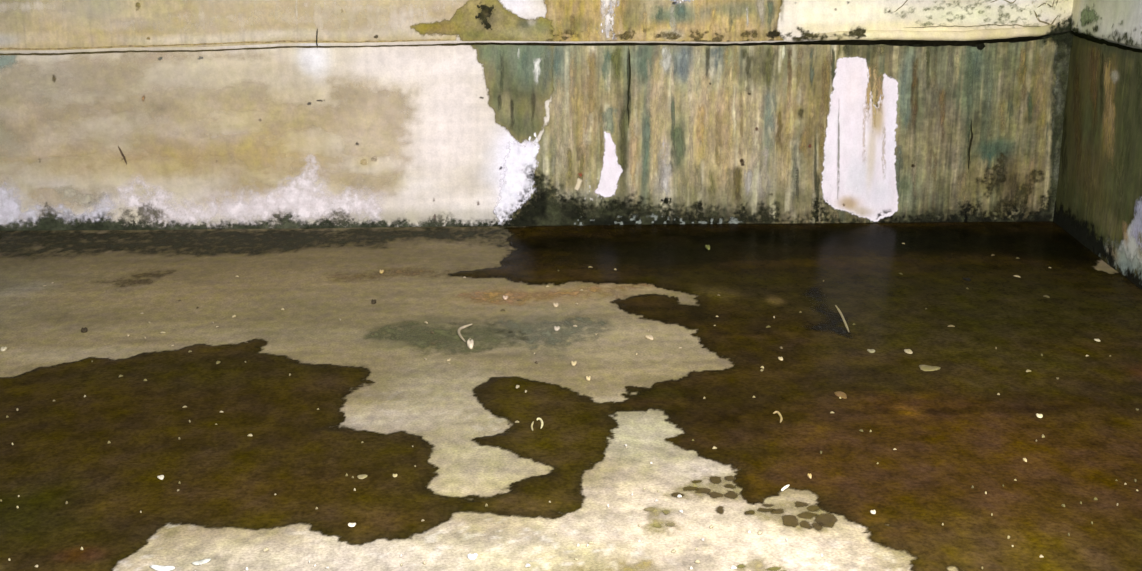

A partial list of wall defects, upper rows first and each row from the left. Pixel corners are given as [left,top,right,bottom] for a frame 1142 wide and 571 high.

flaking render [475,4,494,30]
peeling [601,0,619,39]
flaking render [924,0,1068,27]
peeling [494,133,539,224]
damp [0,0,1142,290]
peeling [574,109,623,201]
peeling [809,57,899,222]
peeling [1130,200,1142,247]
damp [366,317,607,353]